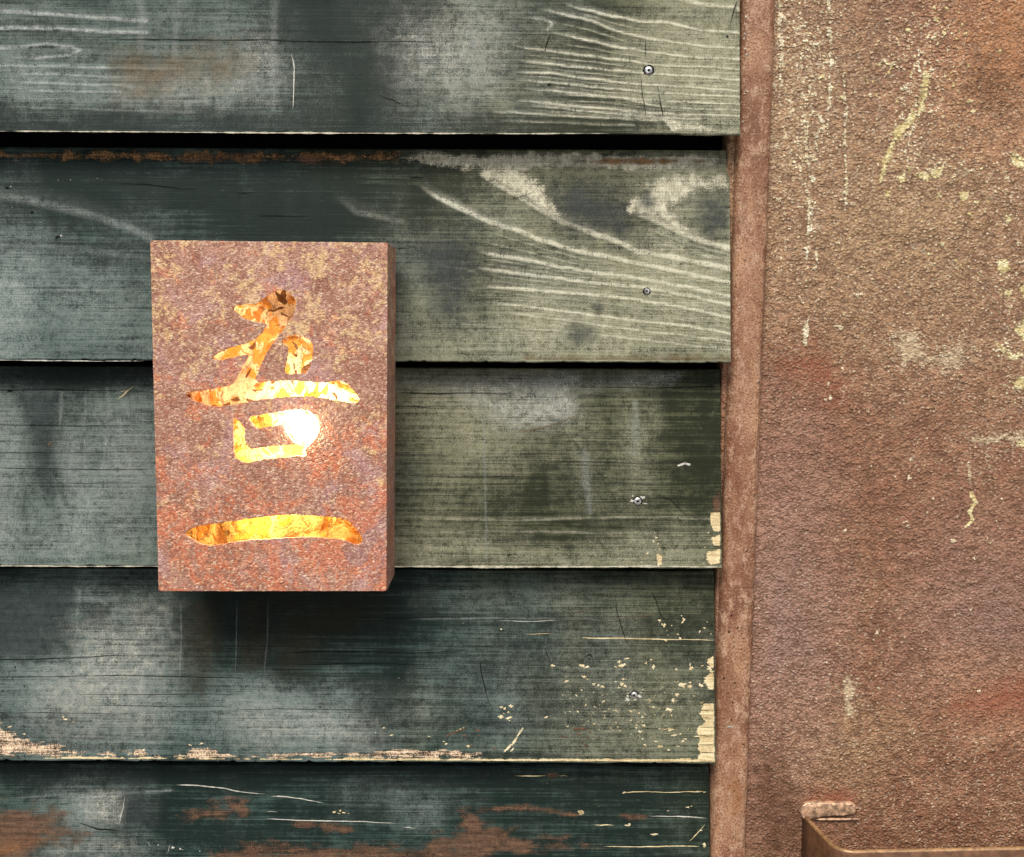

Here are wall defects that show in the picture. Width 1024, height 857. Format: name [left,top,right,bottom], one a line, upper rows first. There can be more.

rust [0,150,400,164]
peeling [703,497,720,565]
peeling [0,656,736,777]